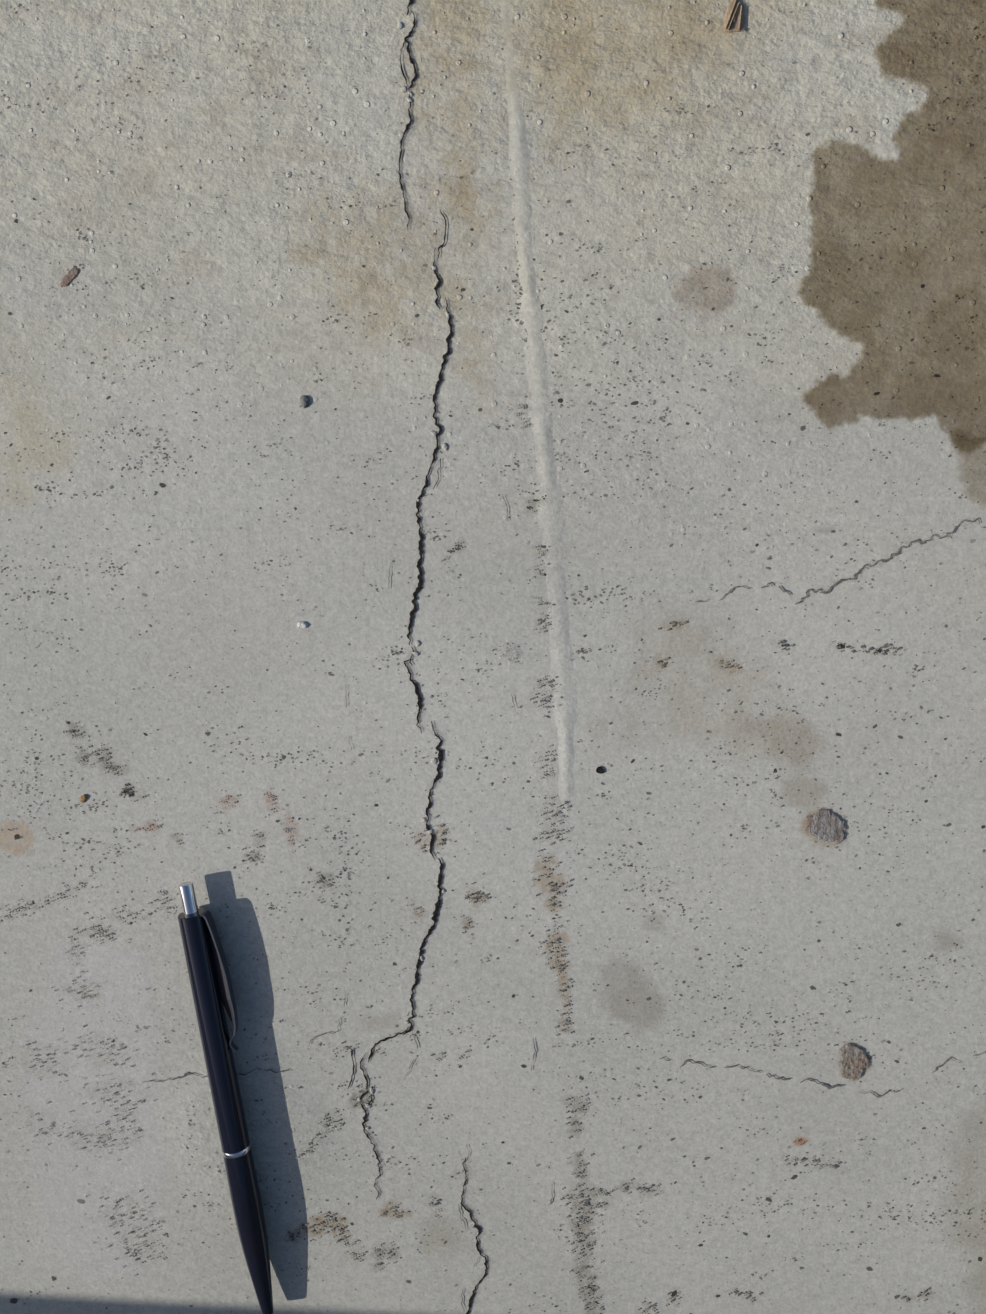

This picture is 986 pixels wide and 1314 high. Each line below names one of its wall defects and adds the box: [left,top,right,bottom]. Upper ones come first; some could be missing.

crack [397,0,418,229]
crack [695,518,986,604]
crack [147,209,453,1200]
crack [458,1145,488,1314]